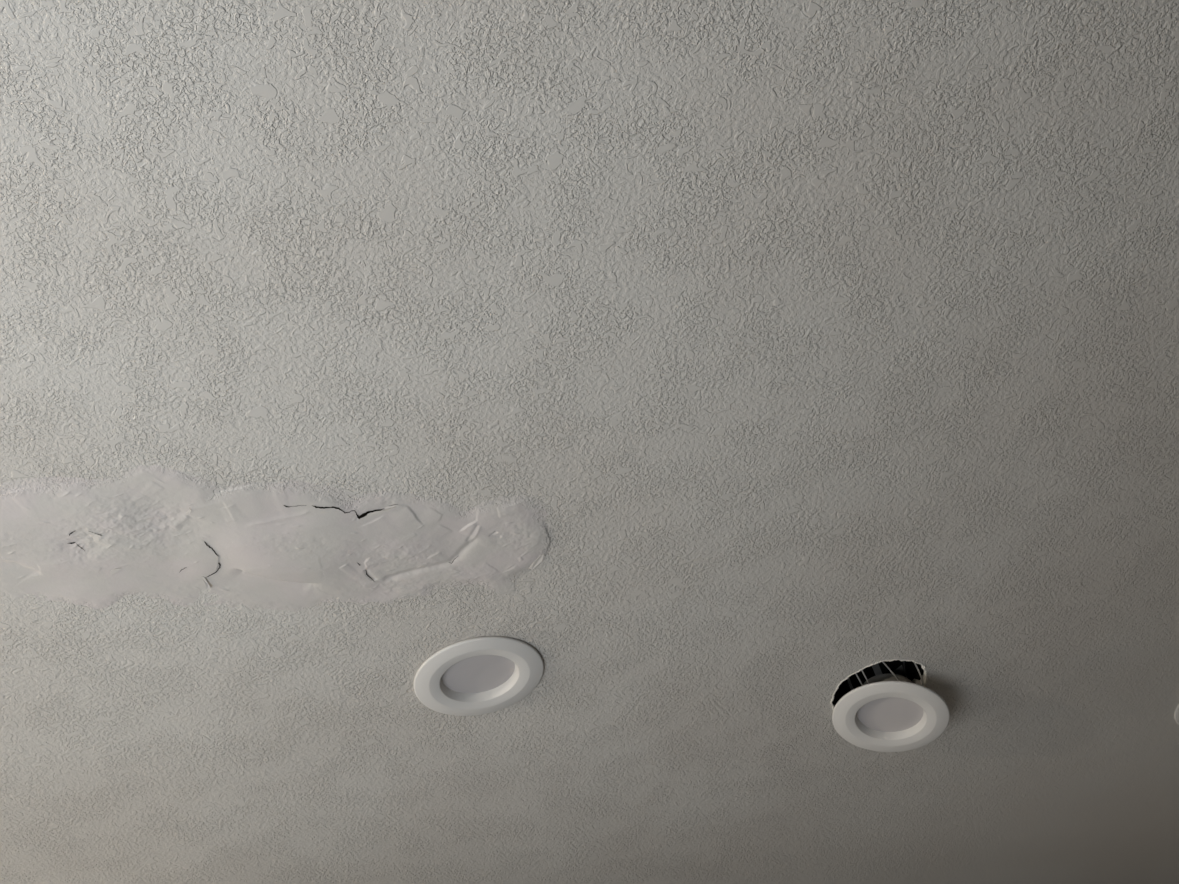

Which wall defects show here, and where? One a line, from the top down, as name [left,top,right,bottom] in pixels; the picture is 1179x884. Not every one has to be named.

crack [283,504,398,519]
peeling [0,464,553,612]
spalling [830,659,928,709]